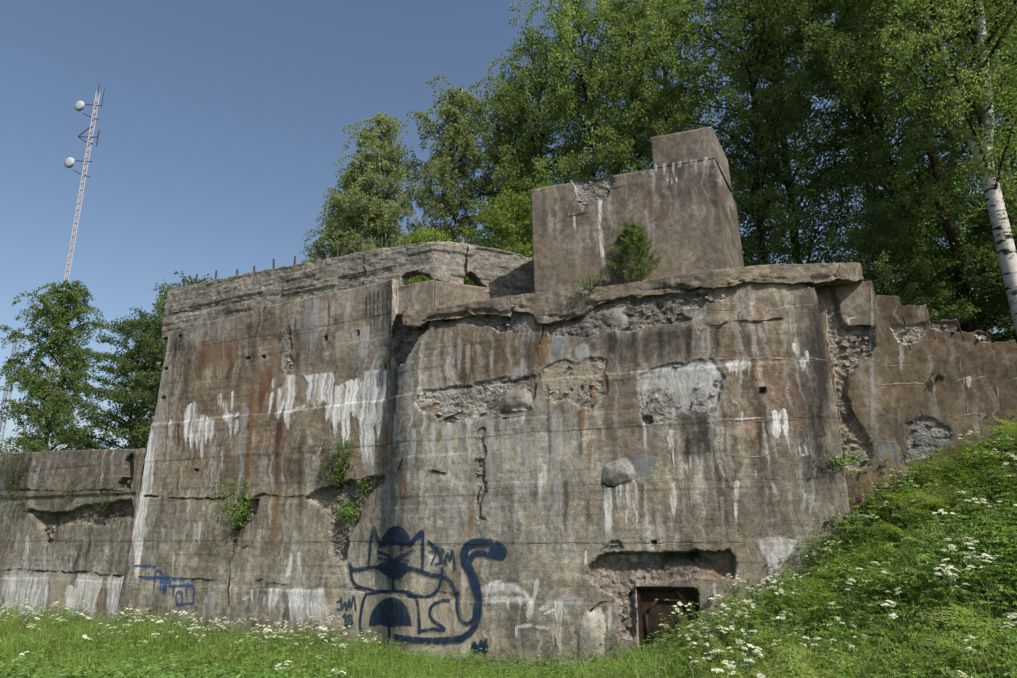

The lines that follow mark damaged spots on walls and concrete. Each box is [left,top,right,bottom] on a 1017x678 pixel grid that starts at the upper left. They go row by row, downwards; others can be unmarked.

crack [0,401,303,500]
water stain [184,391,239,458]
water stain [268,370,387,466]
spalling [388,313,529,370]
spalling [413,356,609,526]
spalling [805,284,876,471]
spalling [890,321,958,346]
spalling [902,416,952,463]
spalling [23,452,134,548]
water stain [4,397,172,620]
crack [3,545,248,607]